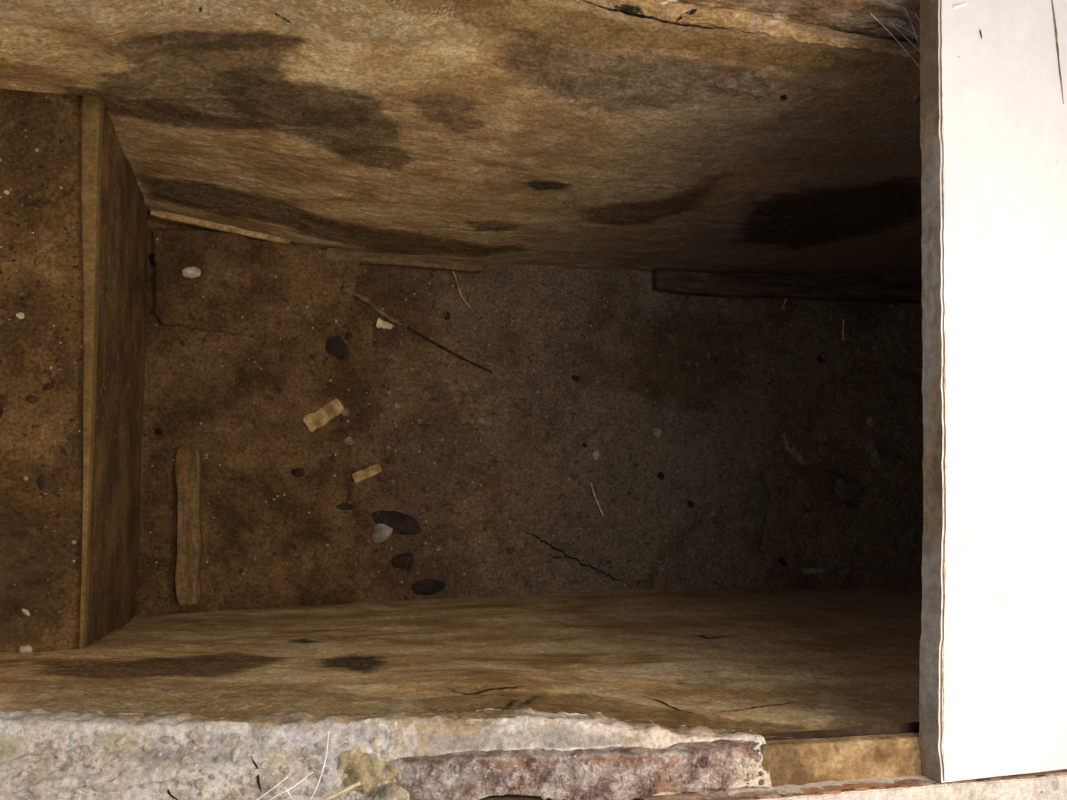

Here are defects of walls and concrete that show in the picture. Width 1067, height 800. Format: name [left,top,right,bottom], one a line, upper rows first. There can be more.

damp [0,0,884,169]
damp [741,179,922,249]